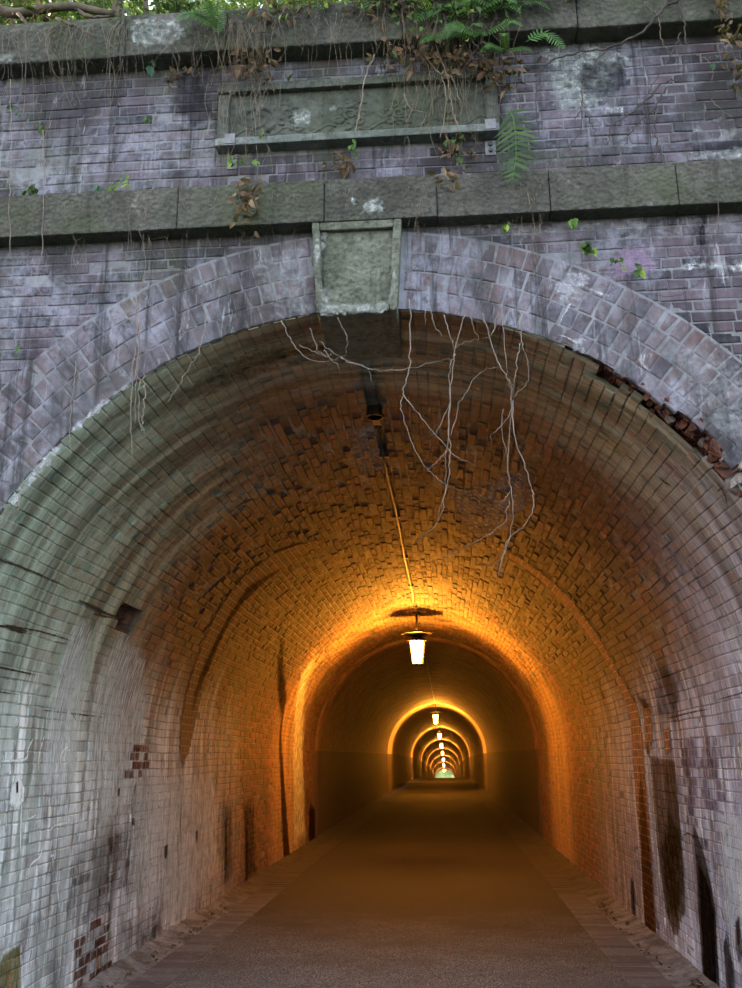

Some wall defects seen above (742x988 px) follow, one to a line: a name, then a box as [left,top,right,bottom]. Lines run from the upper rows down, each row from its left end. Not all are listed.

spalling [537,336,742,501]
damp [651,758,742,988]